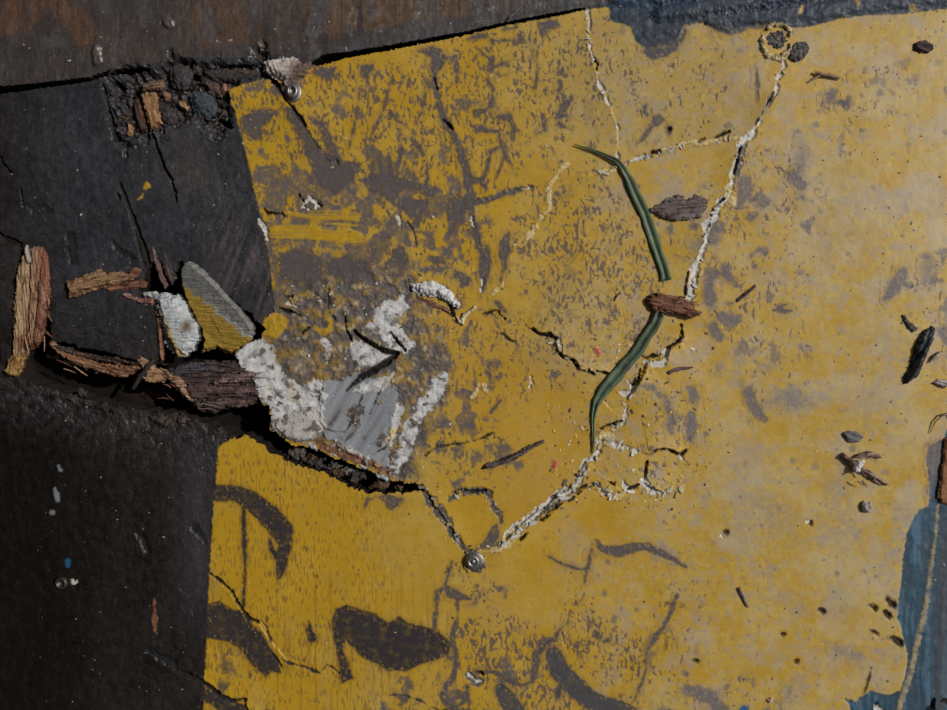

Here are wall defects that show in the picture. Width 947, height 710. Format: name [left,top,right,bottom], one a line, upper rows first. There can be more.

crack [585,7,788,302]
crack [257,193,323,241]
peeling [235,333,334,443]
crack [278,287,407,393]
peeling [345,290,416,430]
peeling [357,491,415,515]
peeling [373,370,451,478]
crack [418,67,687,554]
peeling [902,315,918,332]
peeling [922,438,943,505]
crack [208,572,341,675]
crack [174,670,267,710]